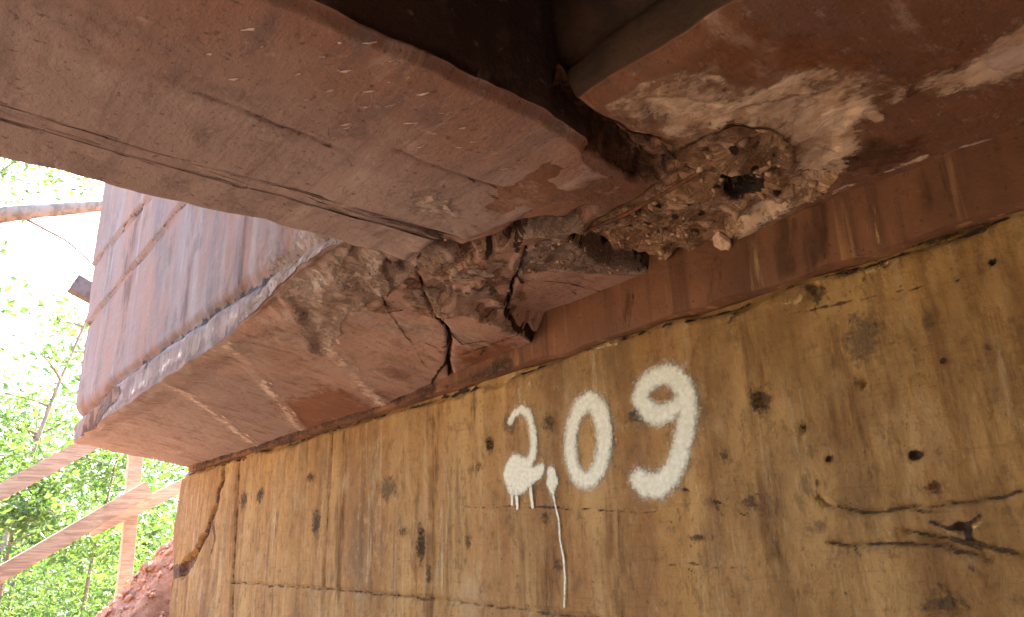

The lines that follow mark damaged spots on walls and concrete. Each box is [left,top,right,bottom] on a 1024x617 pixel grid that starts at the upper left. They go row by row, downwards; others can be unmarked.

spalling [332,68,884,336]
crack [369,218,600,384]
spalling [787,217,1010,310]
spalling [288,386,478,446]
crack [173,471,225,579]
crack [815,479,1022,571]